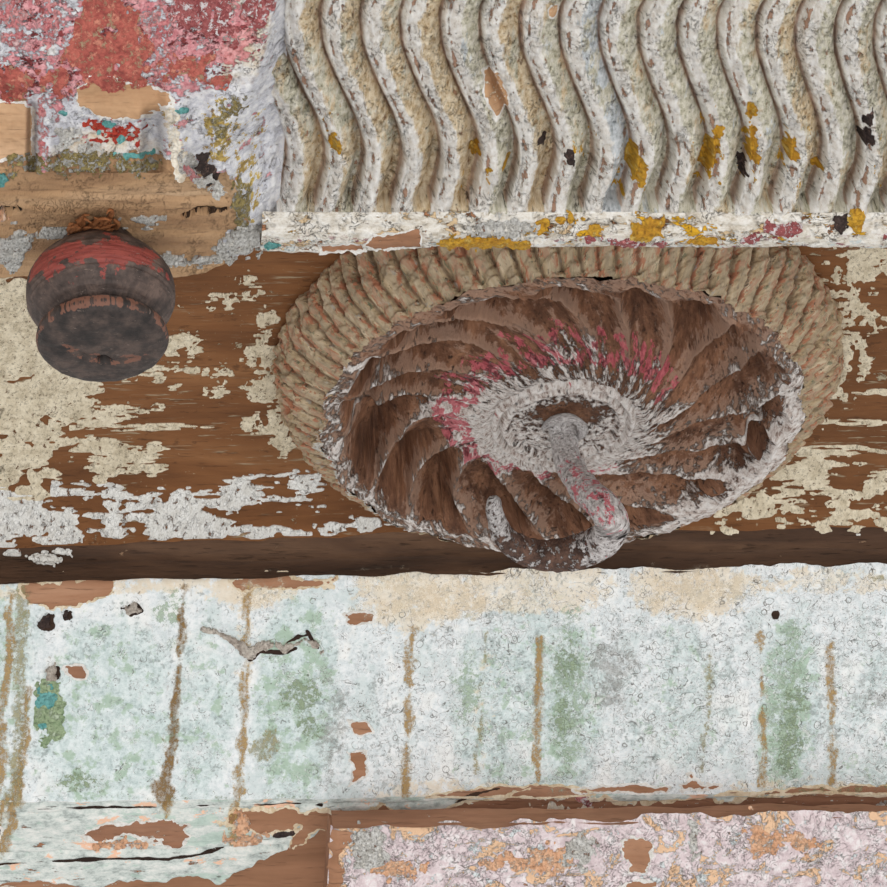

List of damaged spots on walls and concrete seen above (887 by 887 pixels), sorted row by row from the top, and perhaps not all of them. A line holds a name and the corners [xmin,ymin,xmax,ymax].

peeling [318,228,422,255]
peeling [821,233,887,409]
peeling [0,221,391,632]
peeling [710,447,887,536]
damp [4,586,30,806]
crack [200,626,324,662]
damp [278,671,322,737]
damp [548,607,588,764]
damp [768,620,810,778]
damp [57,768,102,793]
peeling [76,819,192,849]
peeling [216,804,430,887]